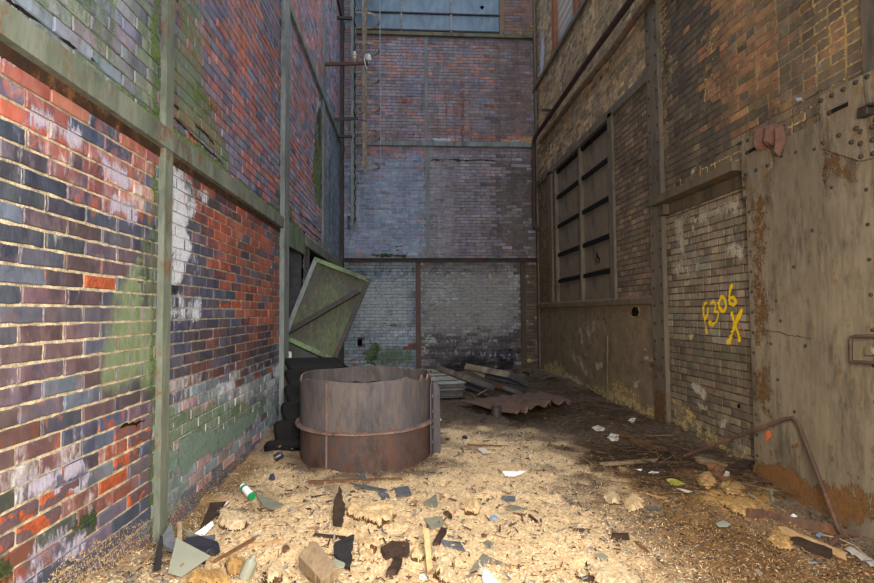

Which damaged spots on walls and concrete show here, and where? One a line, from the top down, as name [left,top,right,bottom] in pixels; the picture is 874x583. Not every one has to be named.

water stain [171,166,208,323]
rust [747,192,773,346]
rust [753,451,874,528]